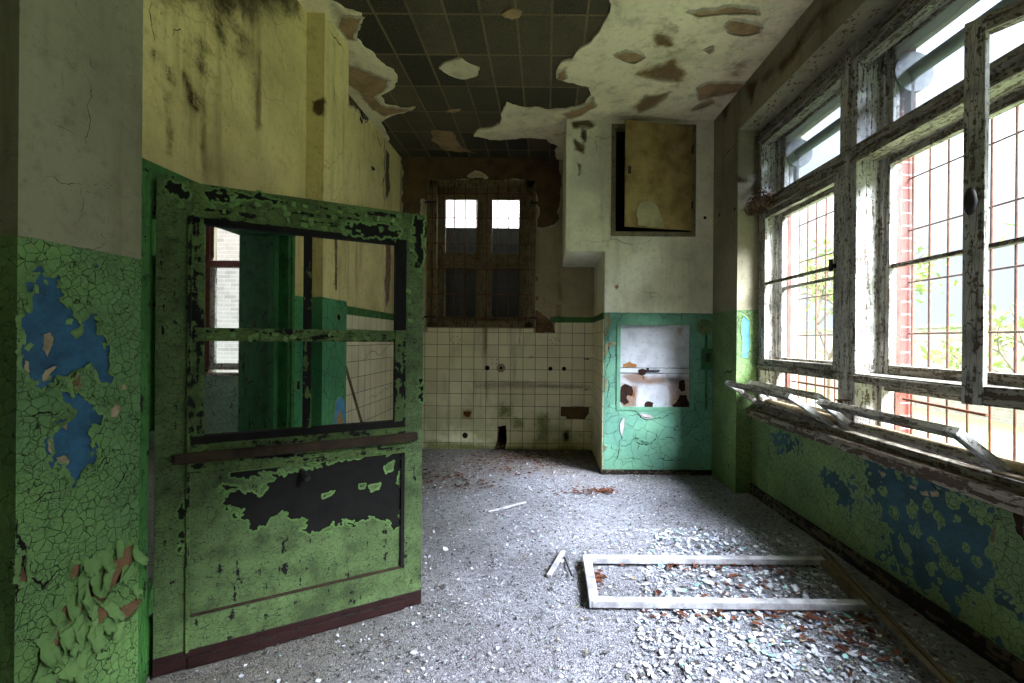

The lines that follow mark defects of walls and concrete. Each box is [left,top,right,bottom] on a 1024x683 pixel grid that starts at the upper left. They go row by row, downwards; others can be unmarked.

water stain [150,0,302,177]
spalling [348,64,412,123]
spalling [439,58,480,79]
water stain [633,30,688,113]
crack [17,409,63,417]
peeling [15,262,128,492]
rust [620,362,689,407]
crack [633,427,693,461]
peeling [739,315,752,360]
crack [15,491,63,602]
peeling [818,459,1024,623]
peeling [32,538,150,683]